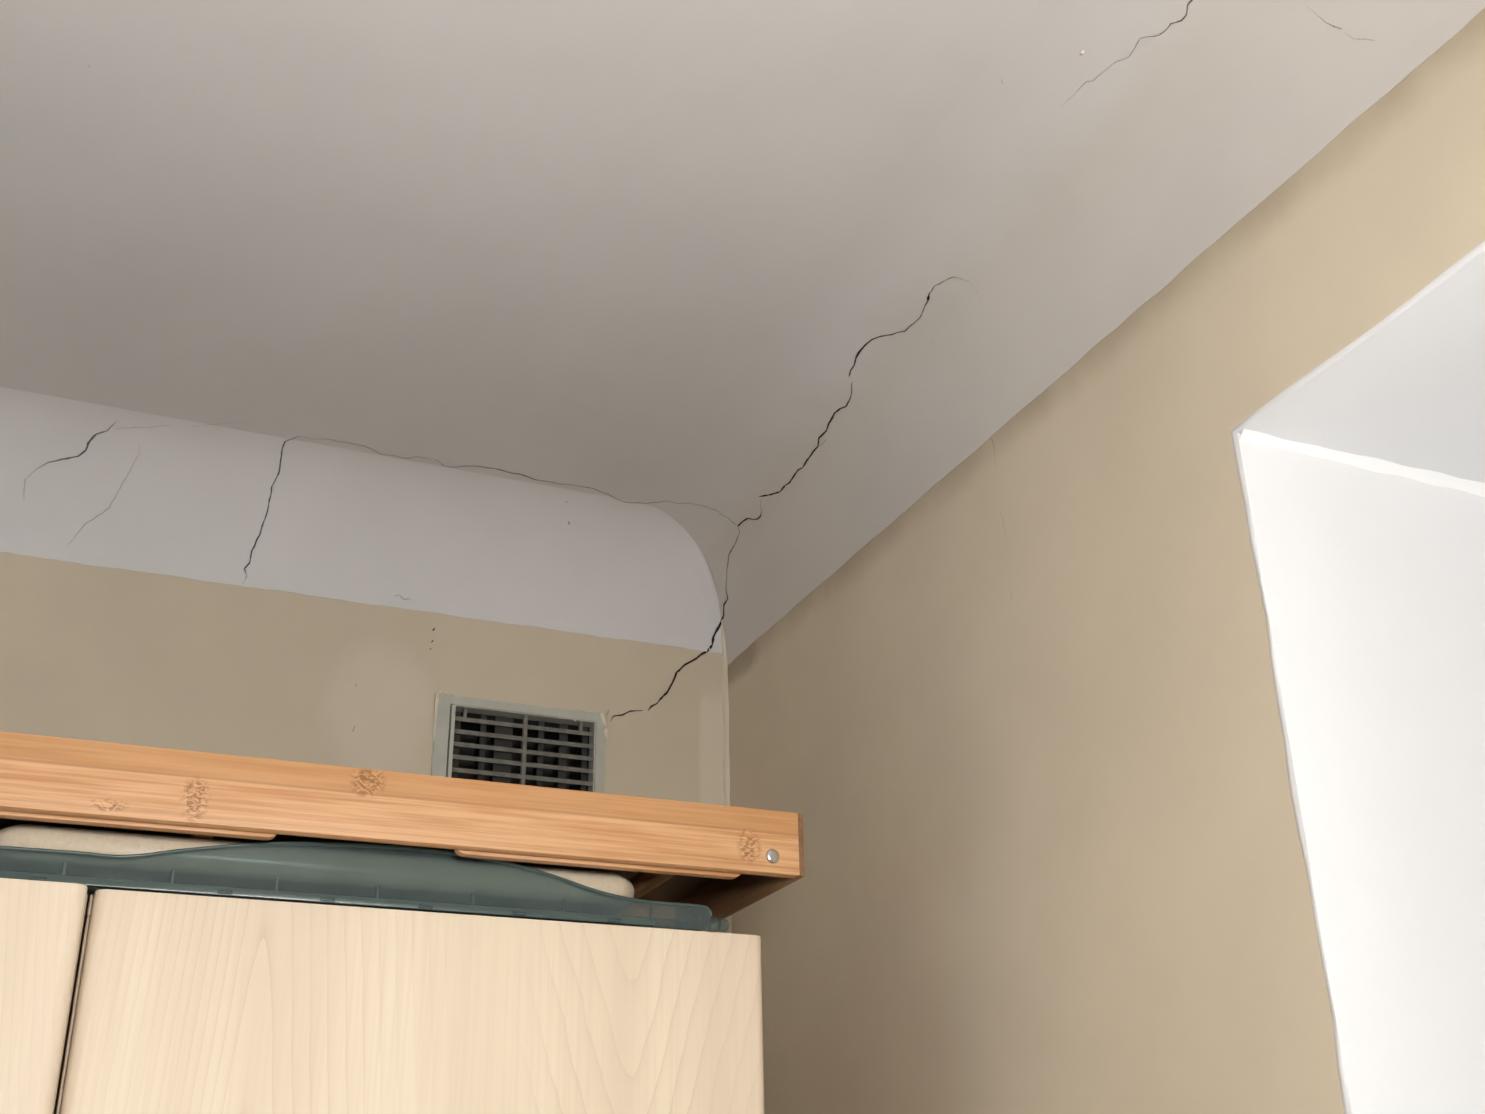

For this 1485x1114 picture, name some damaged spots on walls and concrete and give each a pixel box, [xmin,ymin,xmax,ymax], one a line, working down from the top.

crack [1140,0,1193,39]
crack [48,431,106,463]
crack [244,436,299,573]
crack [346,277,953,720]